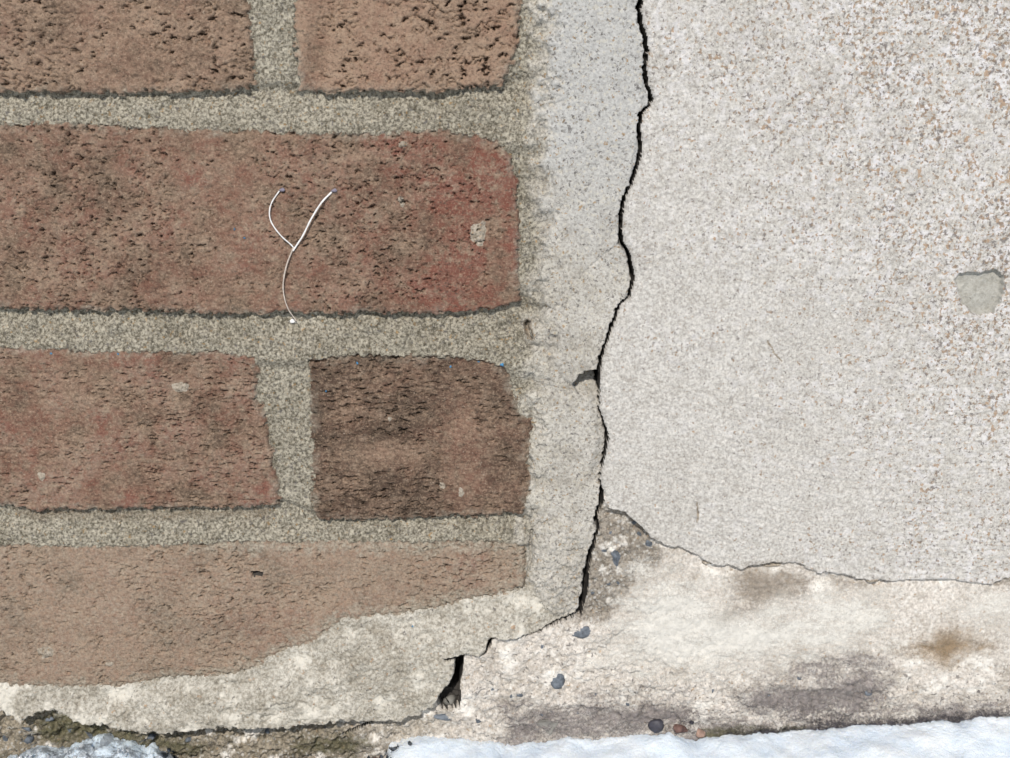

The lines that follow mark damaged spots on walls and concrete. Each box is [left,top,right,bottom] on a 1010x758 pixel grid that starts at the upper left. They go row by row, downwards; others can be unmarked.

crack [522,0,654,636]
spalling [580,502,1010,622]
hole [438,655,464,710]
crack [484,637,498,654]
damp [499,557,1010,746]